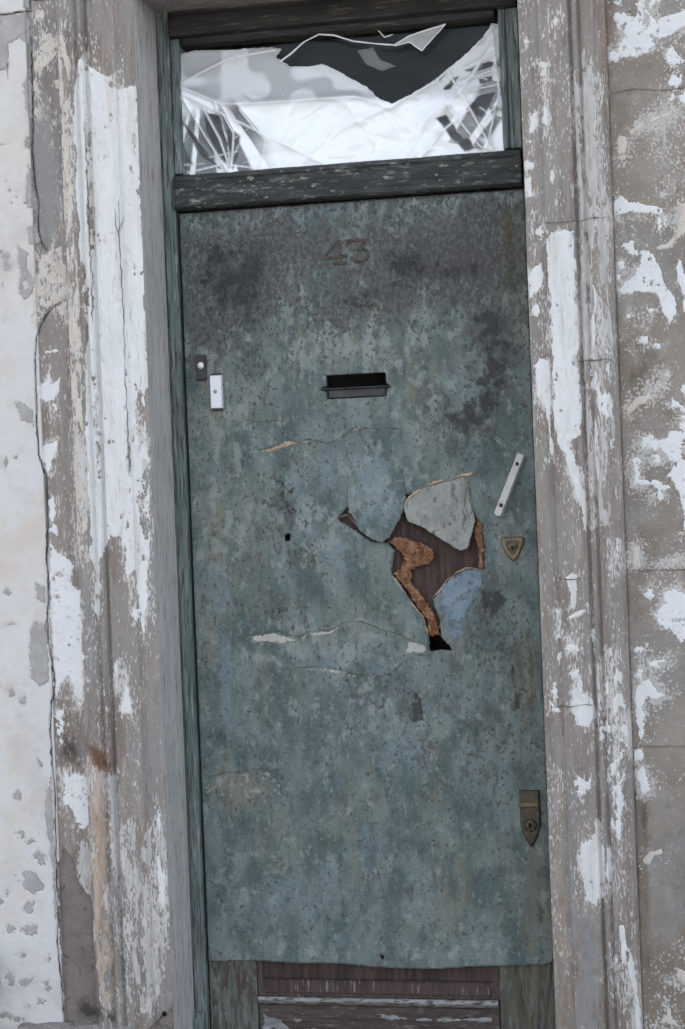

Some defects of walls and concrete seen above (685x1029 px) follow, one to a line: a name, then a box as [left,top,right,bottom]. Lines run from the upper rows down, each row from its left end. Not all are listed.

peeling [606,0,685,155]
peeling [524,161,534,199]
peeling [527,49,685,531]
peeling [0,0,150,706]
crack [248,420,397,450]
crack [249,592,424,677]
peeling [440,569,481,642]
peeling [556,573,596,665]
peeling [643,589,685,643]
peeling [114,664,132,714]
peeling [550,643,664,907]
peeling [376,1014,492,1023]